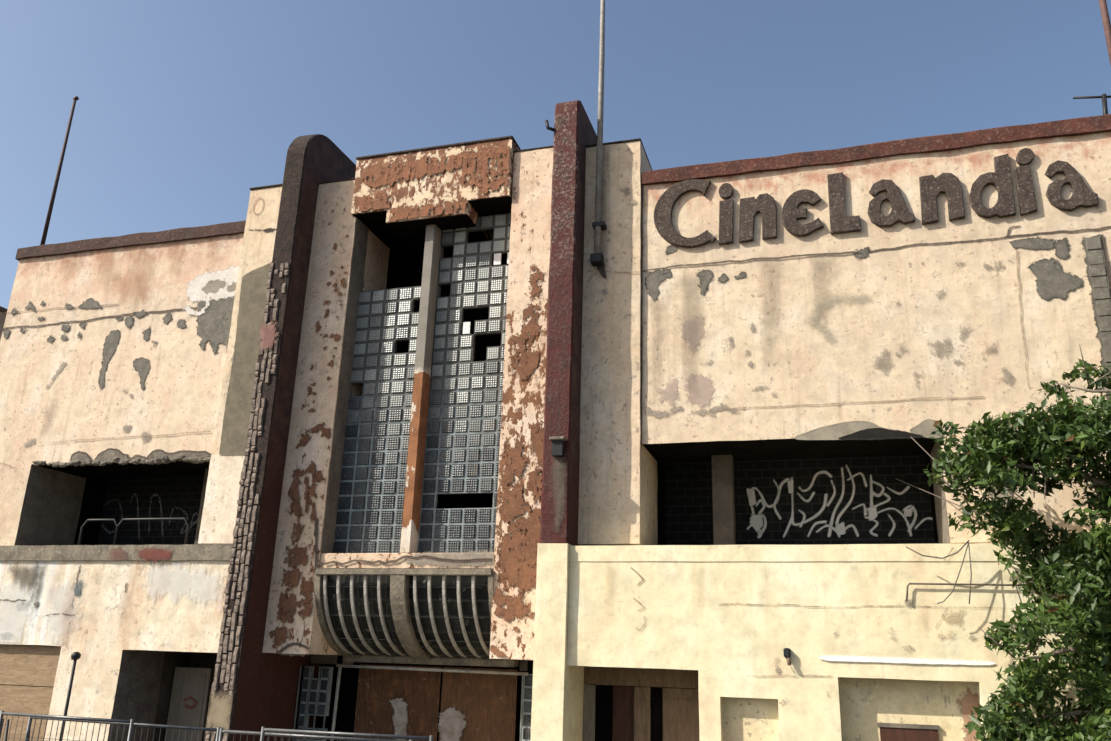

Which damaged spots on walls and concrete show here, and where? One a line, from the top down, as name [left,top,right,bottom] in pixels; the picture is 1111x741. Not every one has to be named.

peeling [354,144,510,220]
peeling [47,298,101,343]
peeling [98,309,157,389]
peeling [123,357,150,398]
peeling [163,313,186,329]
peeling [186,264,240,302]
peeling [299,266,347,446]
peeling [509,264,548,380]
spalling [1009,234,1111,399]
spalling [32,425,211,468]
damp [12,565,43,601]
peeling [269,460,326,657]